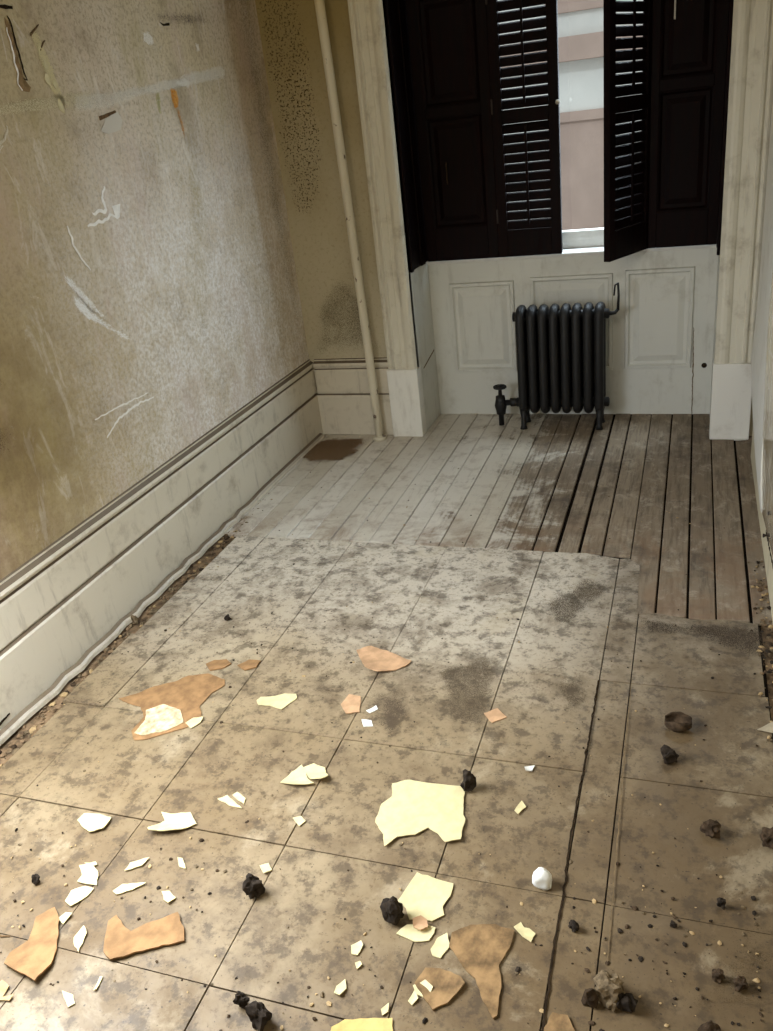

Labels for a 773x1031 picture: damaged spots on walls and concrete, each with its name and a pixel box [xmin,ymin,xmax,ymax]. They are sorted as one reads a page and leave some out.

damp [235,0,323,316]